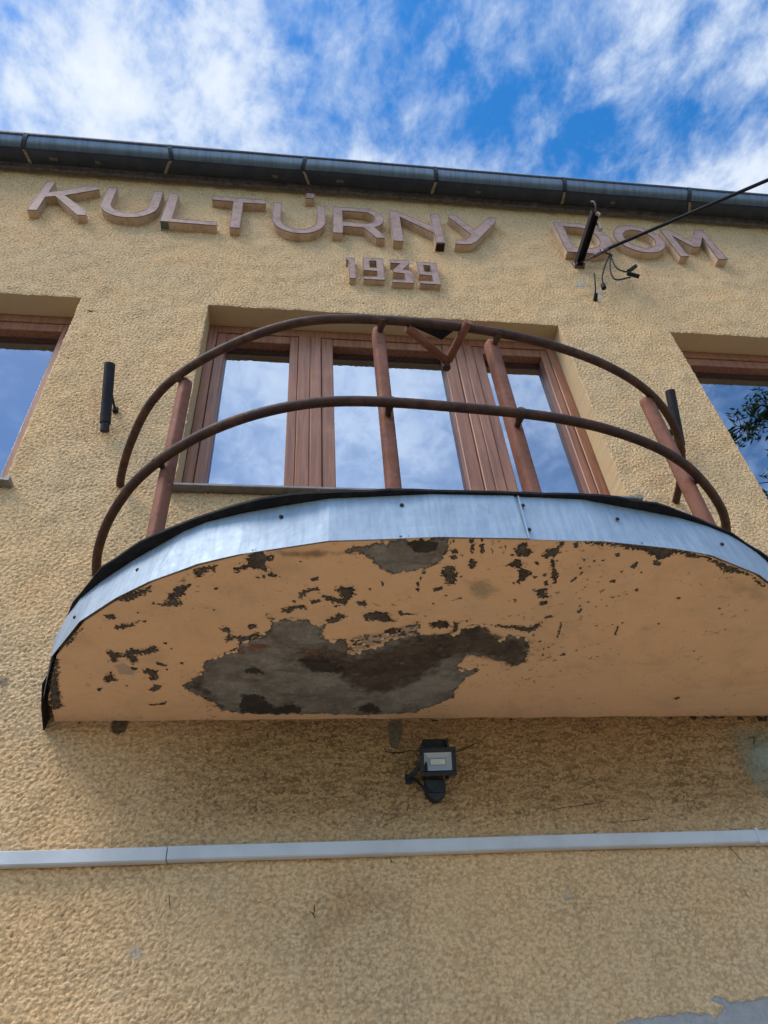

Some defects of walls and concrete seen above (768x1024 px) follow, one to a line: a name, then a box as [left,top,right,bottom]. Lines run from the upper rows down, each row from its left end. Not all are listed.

peeling [116,565,218,607]
peeling [103,612,146,630]
spalling [182,535,766,716]
peeling [97,642,184,706]
peeling [618,996,768,1024]